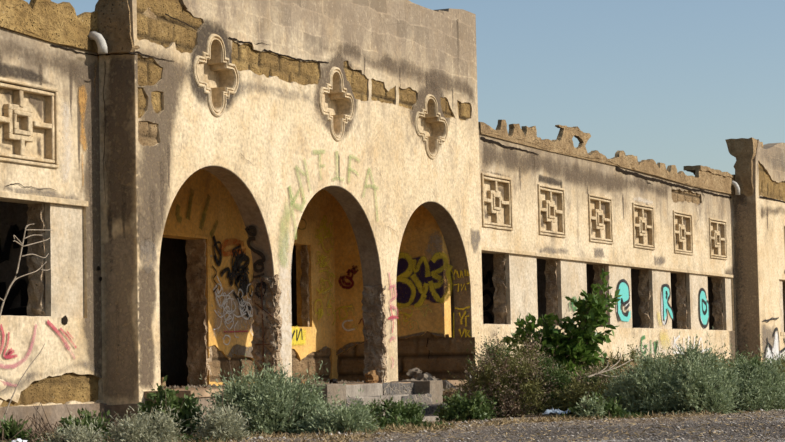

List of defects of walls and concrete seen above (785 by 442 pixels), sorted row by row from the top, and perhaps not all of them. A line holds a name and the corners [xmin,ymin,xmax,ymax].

flaking render [137,0,202,53]
flaking render [138,54,162,118]
flaking render [231,41,320,85]
leakage [316,45,365,135]
flaking render [344,61,416,110]
leakage [378,56,473,123]
flaking render [441,97,471,121]
flaking render [758,162,785,202]
leakage [0,20,232,398]
spalling [204,274,387,383]
flaking render [397,331,476,381]
flaking render [0,373,99,407]